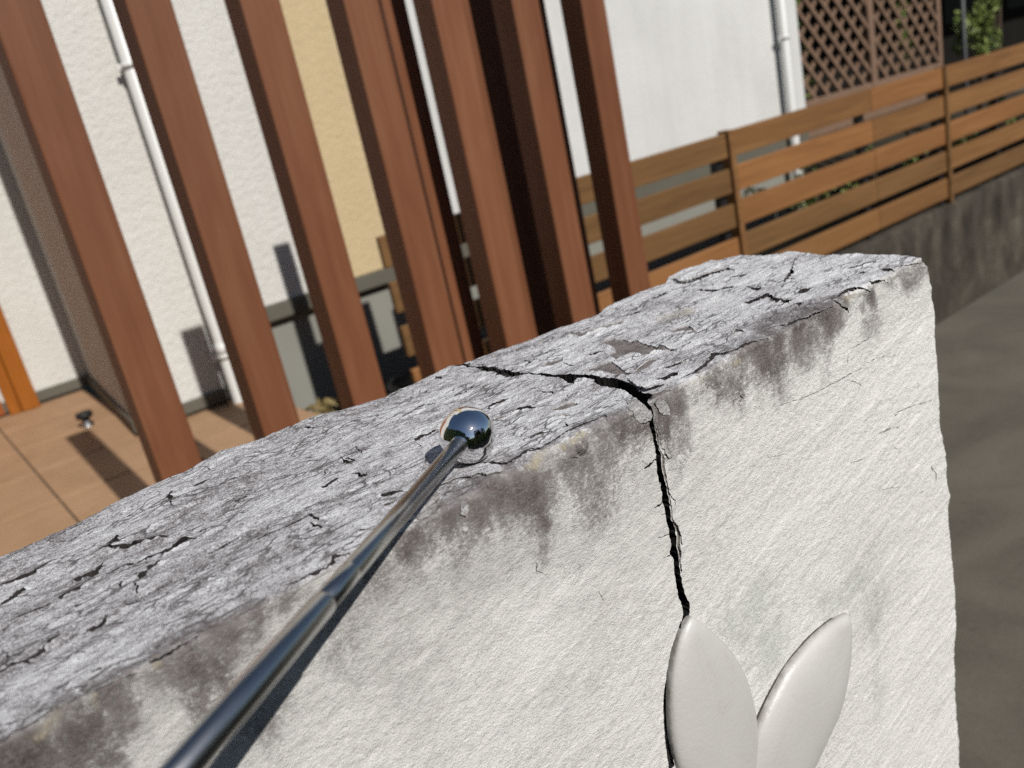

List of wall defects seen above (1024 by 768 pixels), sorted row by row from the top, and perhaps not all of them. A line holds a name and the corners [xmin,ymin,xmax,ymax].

damp [707,295,850,409]
damp [862,286,877,324]
crack [0,513,323,632]
crack [167,467,211,505]
crack [287,528,371,585]
crack [322,446,403,506]
damp [367,384,691,591]
crack [411,258,923,768]
crack [0,633,199,743]